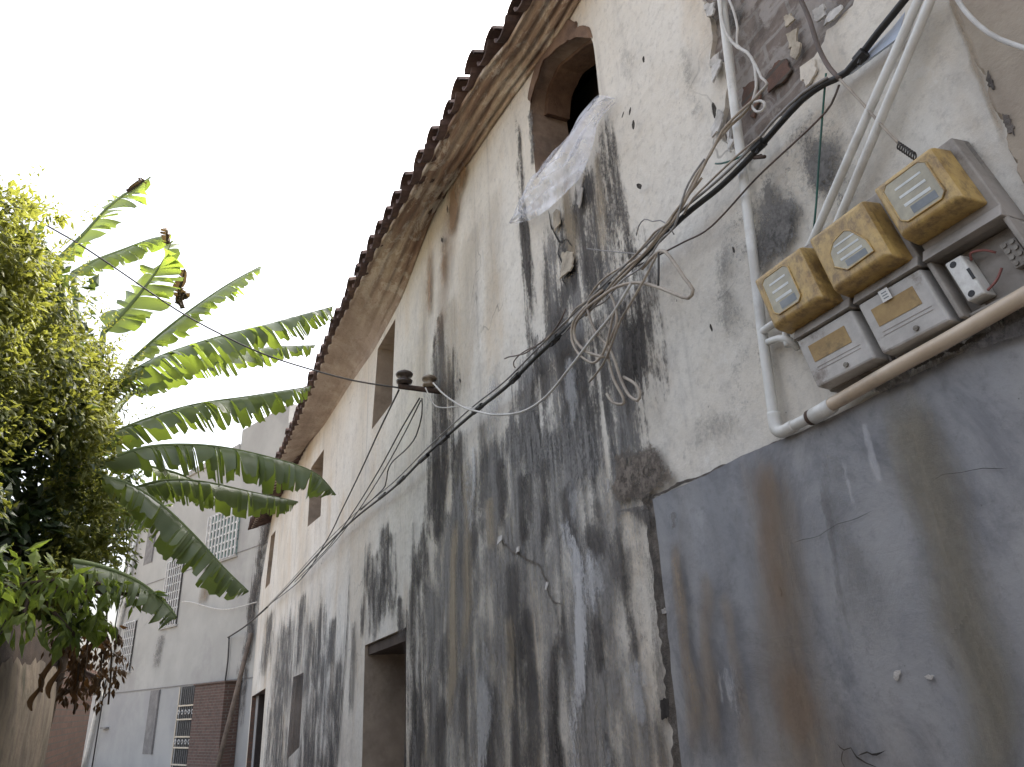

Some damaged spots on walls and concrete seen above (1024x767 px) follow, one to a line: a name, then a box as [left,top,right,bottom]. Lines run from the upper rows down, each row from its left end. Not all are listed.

flaking render [703,0,854,152]
water stain [237,112,668,767]